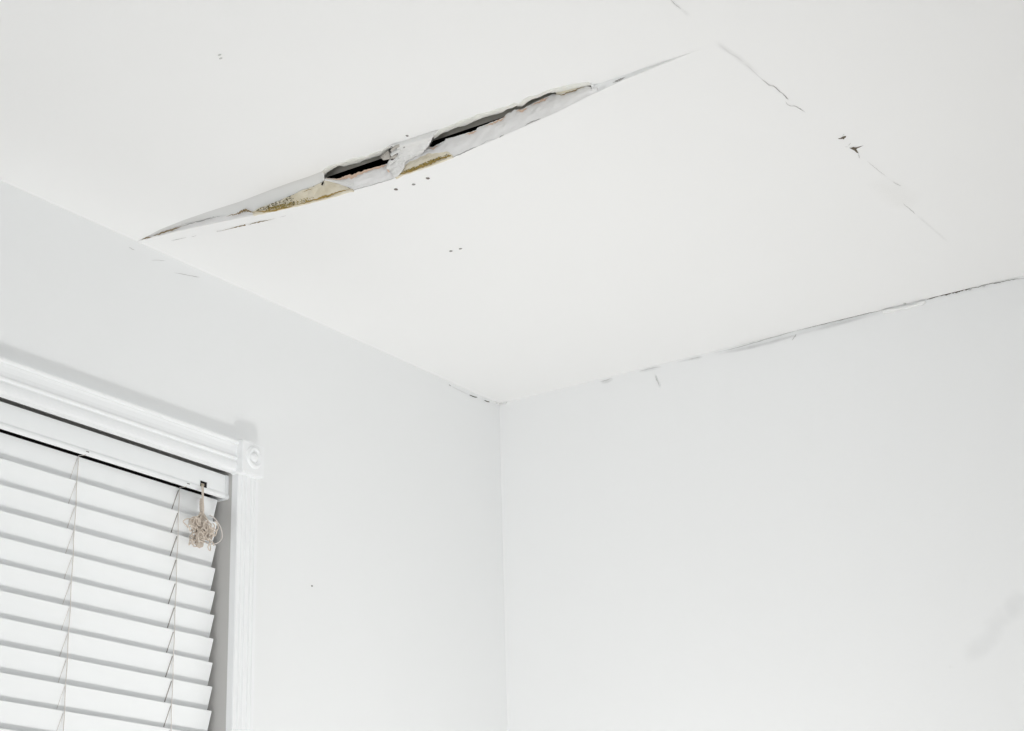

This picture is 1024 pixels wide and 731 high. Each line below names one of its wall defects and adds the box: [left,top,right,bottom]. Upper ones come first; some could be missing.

spalling [428,82,591,147]
spalling [322,144,405,178]
crack [927,278,1024,300]